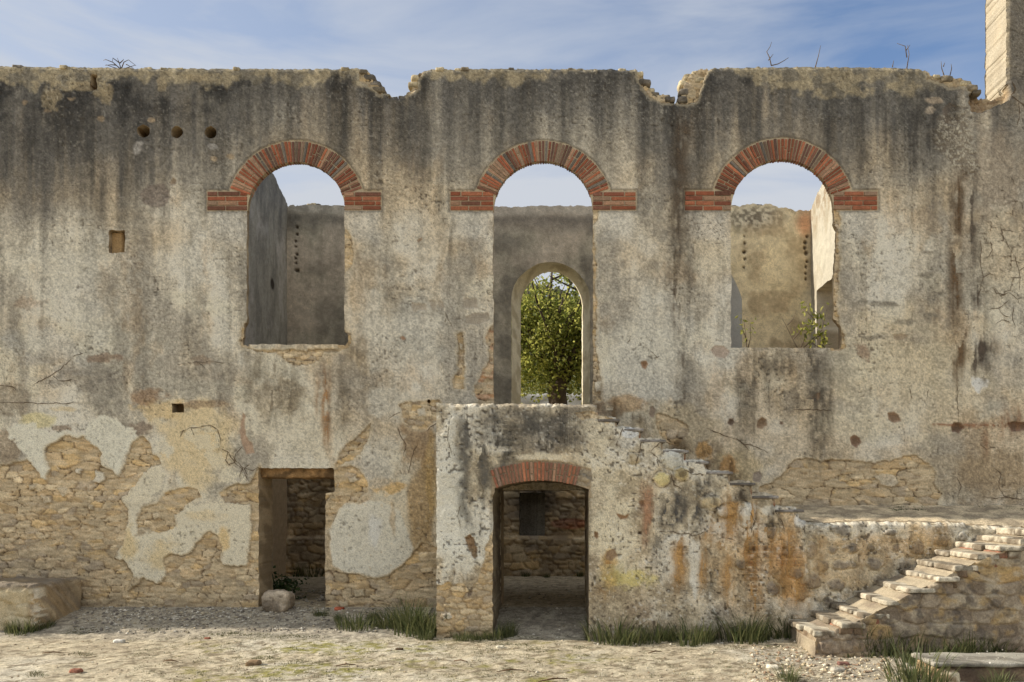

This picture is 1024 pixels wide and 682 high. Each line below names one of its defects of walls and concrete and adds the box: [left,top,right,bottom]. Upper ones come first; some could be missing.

water stain [672,123,689,237]
water stain [955,177,975,240]
water stain [950,250,979,309]
crack [978,179,1024,325]
water stain [953,340,989,375]
flaking render [396,397,442,433]
flaking render [0,412,263,607]
flaking render [325,421,374,534]
flaking render [752,434,944,506]
rust [674,540,685,581]
rust [719,501,803,609]